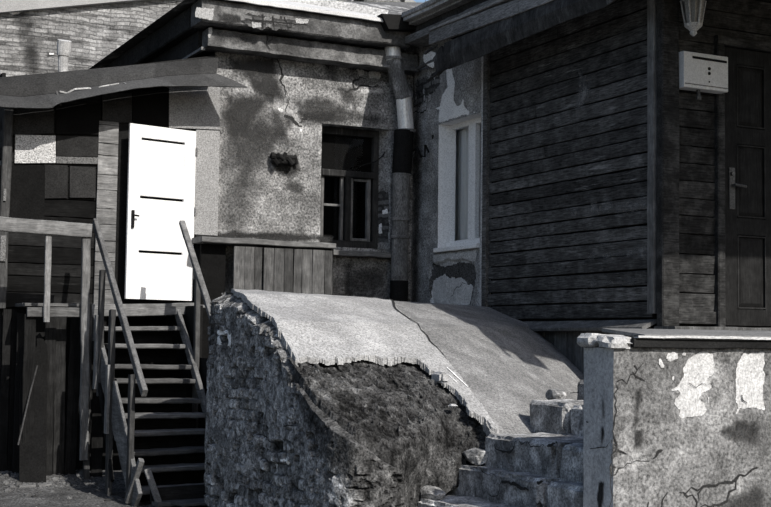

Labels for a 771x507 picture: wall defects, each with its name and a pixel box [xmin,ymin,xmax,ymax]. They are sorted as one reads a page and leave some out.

crack [266,34,329,127]
damp [298,89,378,123]
peeling [413,68,477,122]
damp [226,58,291,219]
damp [274,164,302,192]
spalling [429,251,477,305]
flaking render [659,352,715,419]
flaking render [736,352,765,414]
crack [590,363,645,507]
crack [647,467,757,507]